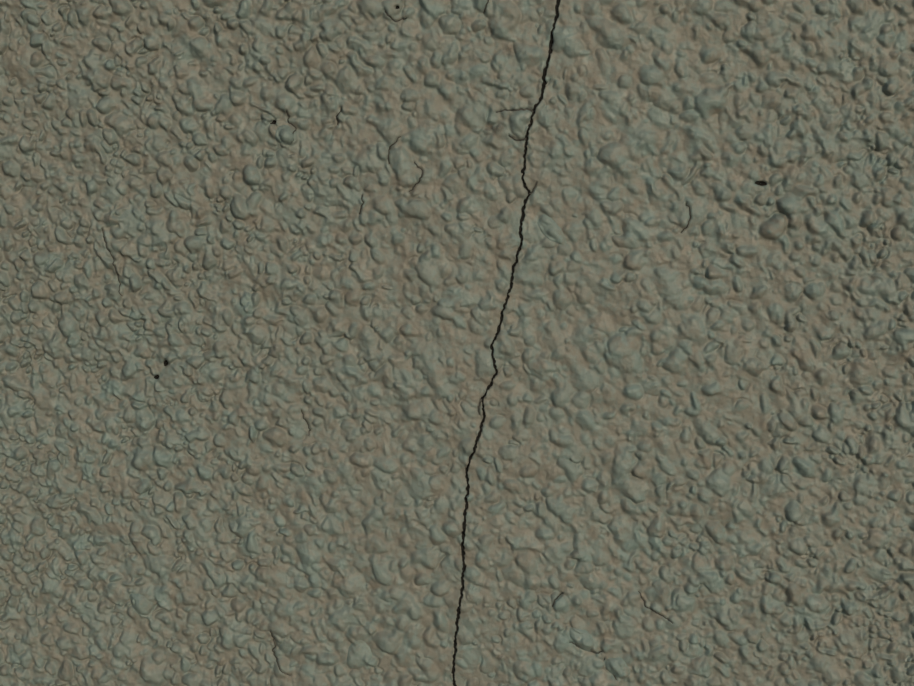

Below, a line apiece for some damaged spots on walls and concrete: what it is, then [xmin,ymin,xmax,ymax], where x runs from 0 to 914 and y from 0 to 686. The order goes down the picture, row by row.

crack [451,0,560,686]